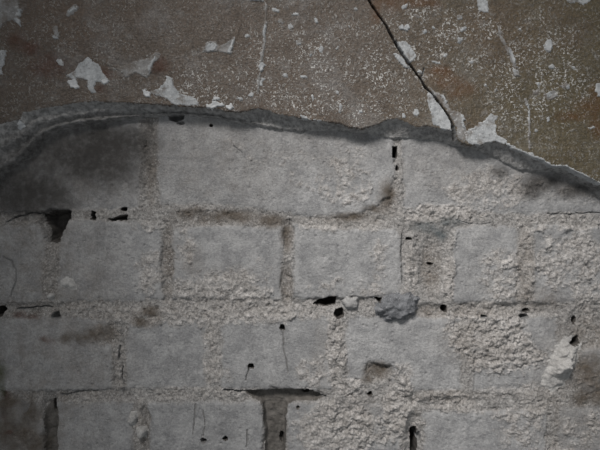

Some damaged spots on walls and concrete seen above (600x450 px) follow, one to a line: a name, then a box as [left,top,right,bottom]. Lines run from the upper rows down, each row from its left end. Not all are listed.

peeling [66,52,161,93]
peeling [142,76,199,106]
peeling [202,36,235,54]
peeling [393,41,416,68]
crack [367,0,457,141]
peeling [427,87,468,142]
spalling [0,97,600,450]